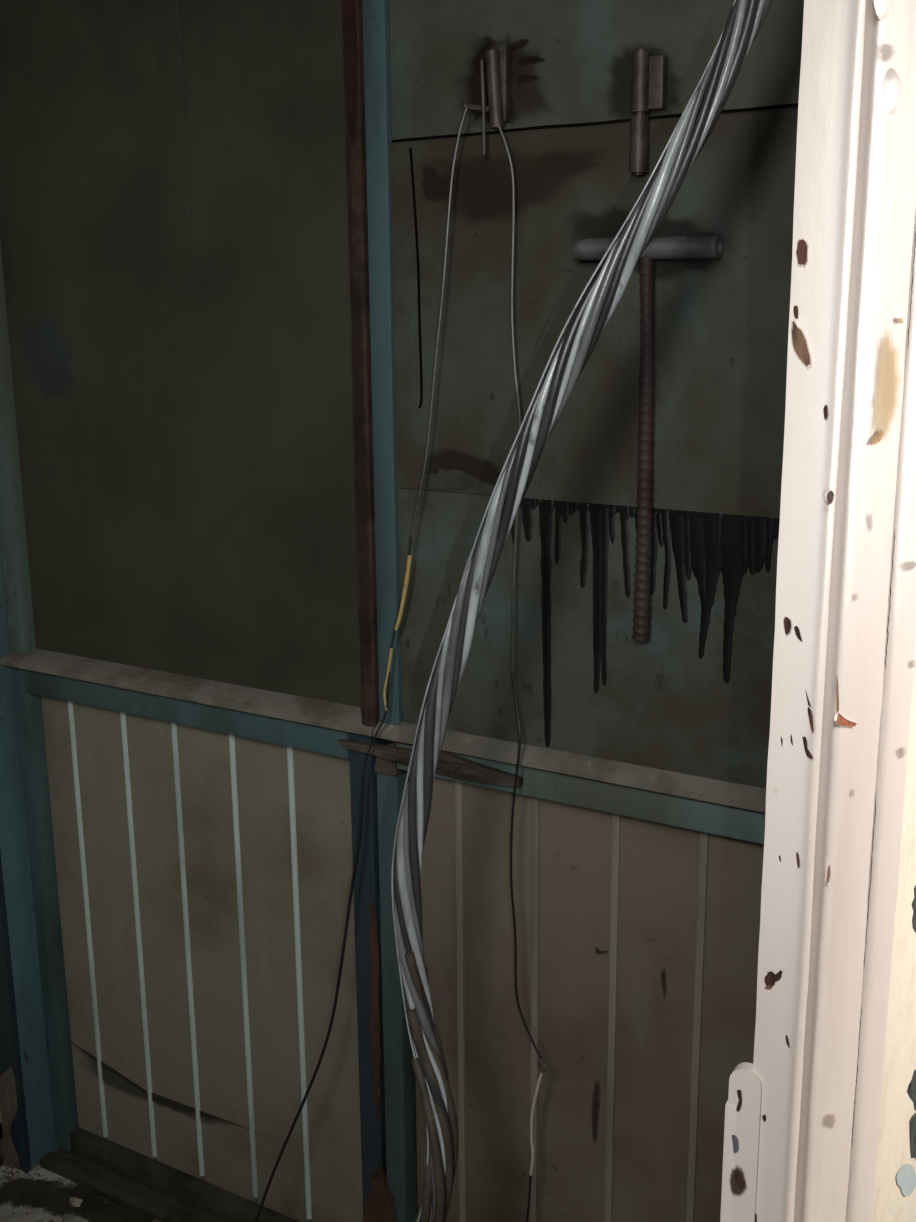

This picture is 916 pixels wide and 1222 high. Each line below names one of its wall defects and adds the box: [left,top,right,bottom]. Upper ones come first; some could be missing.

peeling [796,238,808,267]
peeling [791,305,812,370]
damp [871,342,899,445]
peeling [825,490,834,505]
damp [511,498,638,747]
damp [651,509,774,683]
peeling [783,616,802,642]
peeling [781,689,814,759]
peeling [834,677,857,728]
peeling [908,1070,916,1158]